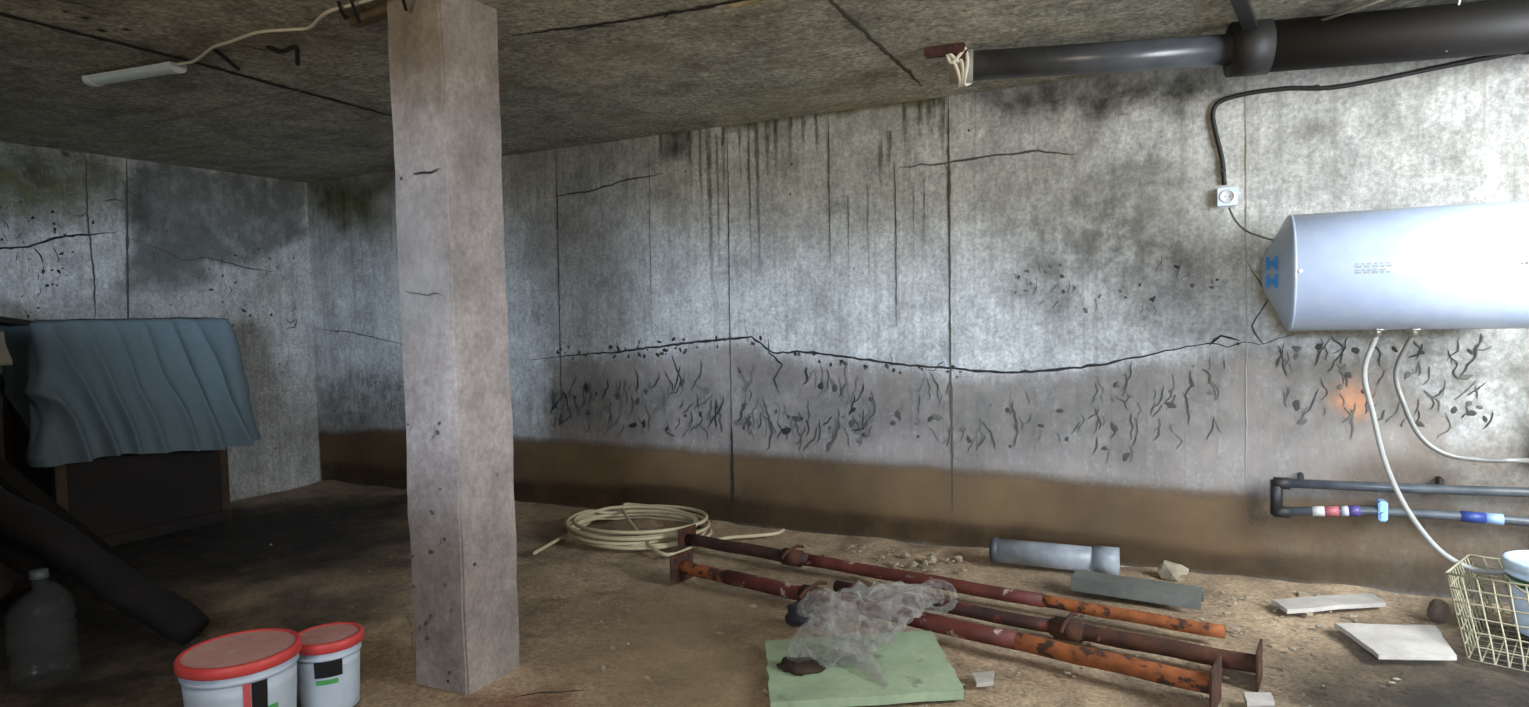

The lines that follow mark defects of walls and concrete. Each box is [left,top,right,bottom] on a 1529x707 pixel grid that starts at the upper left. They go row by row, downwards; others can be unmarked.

damp [660,119,792,205]
crack [0,158,272,318]
crack [532,262,1293,395]